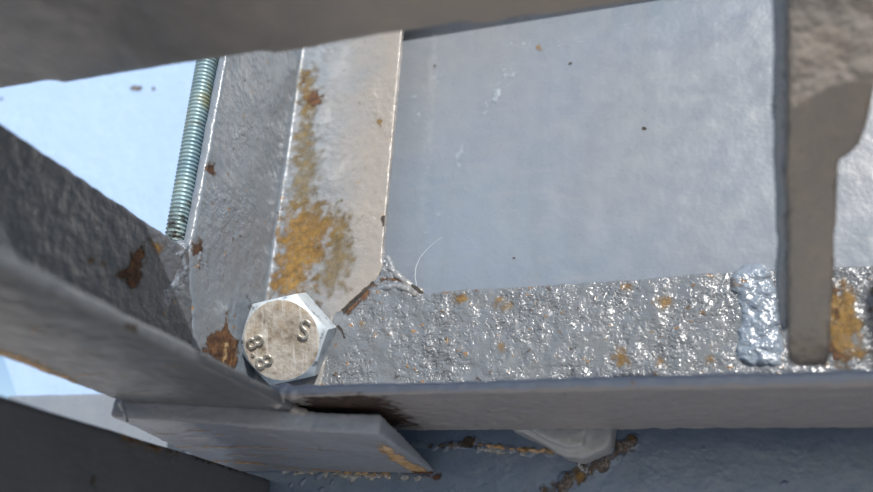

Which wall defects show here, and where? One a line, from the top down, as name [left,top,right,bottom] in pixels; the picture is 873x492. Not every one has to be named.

corrosion [271,71,354,294]
corrosion [117,240,161,289]
corrosion [202,318,238,368]
corrosion [830,281,868,361]
corrosion [298,392,418,427]